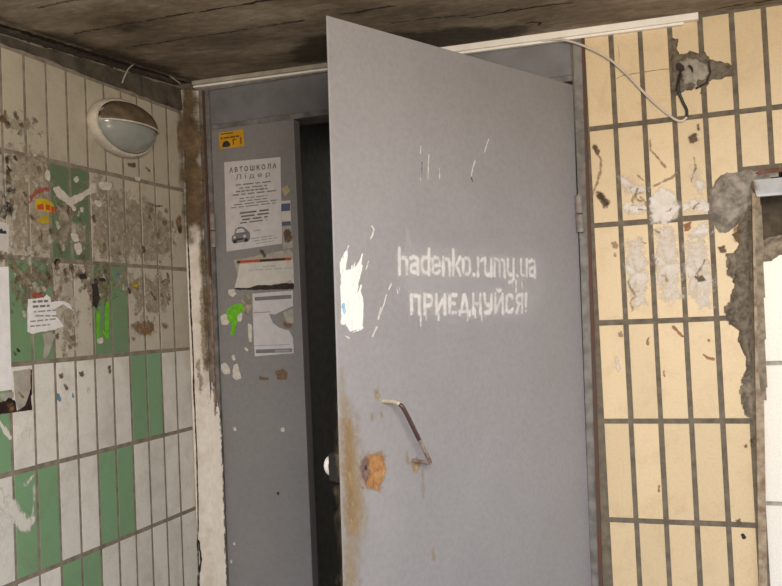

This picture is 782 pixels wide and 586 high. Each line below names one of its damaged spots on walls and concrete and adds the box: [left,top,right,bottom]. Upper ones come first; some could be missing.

crack [0,0,304,84]
leakage [293,36,327,62]
crack [339,3,570,26]
leakage [394,26,526,47]
spalling [670,38,734,96]
peeling [0,149,50,220]
peeling [12,182,112,314]
spalling [724,205,767,446]
rust [345,421,386,534]